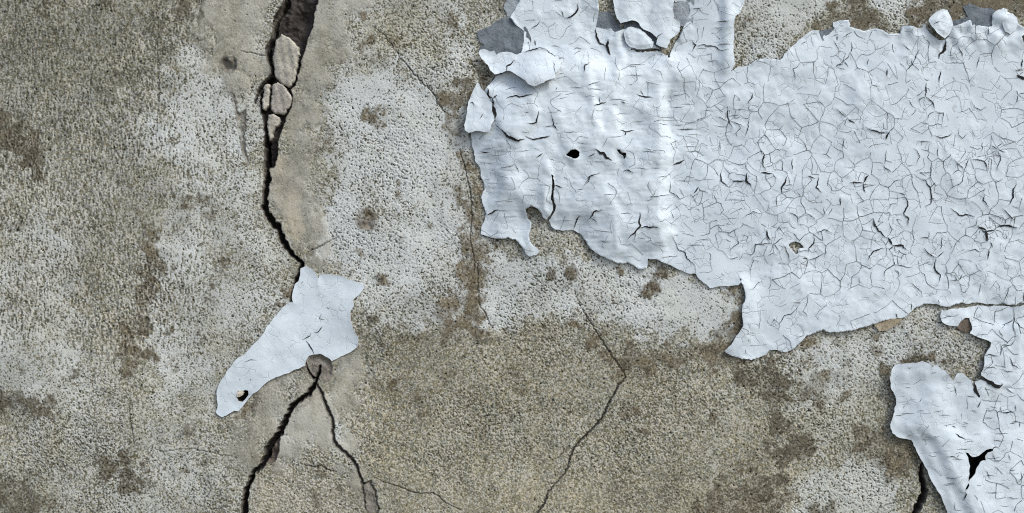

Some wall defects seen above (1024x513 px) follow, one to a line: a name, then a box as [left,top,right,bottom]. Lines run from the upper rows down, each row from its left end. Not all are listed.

peeling [702,0,745,39]
crack [261,138,305,302]
peeling [657,8,1024,513]
peeling [216,266,365,417]
crack [241,363,377,513]
crack [537,377,626,513]